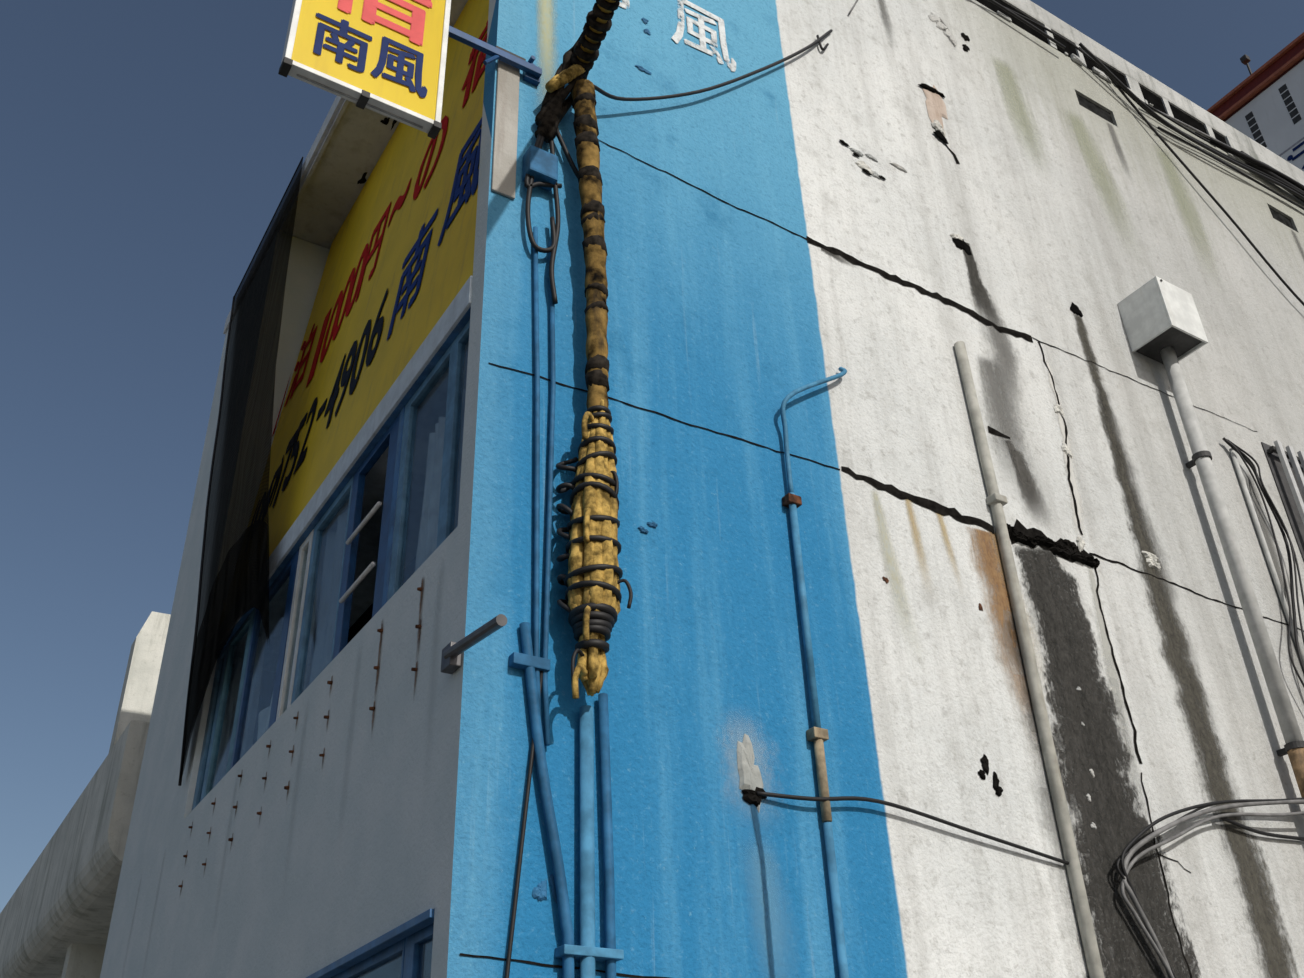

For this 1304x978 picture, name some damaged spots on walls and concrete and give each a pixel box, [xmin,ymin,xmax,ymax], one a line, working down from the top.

peeling [840,140,907,180]
flaking render [918,83,960,164]
leakage [950,233,1040,501]
corrosion [374,624,383,685]
corrosion [415,579,423,643]
crack [460,139,1304,978]
corrosion [972,529,1026,692]
leakage [1070,302,1298,978]
flaking render [978,754,1003,796]
leakage [1012,548,1201,978]